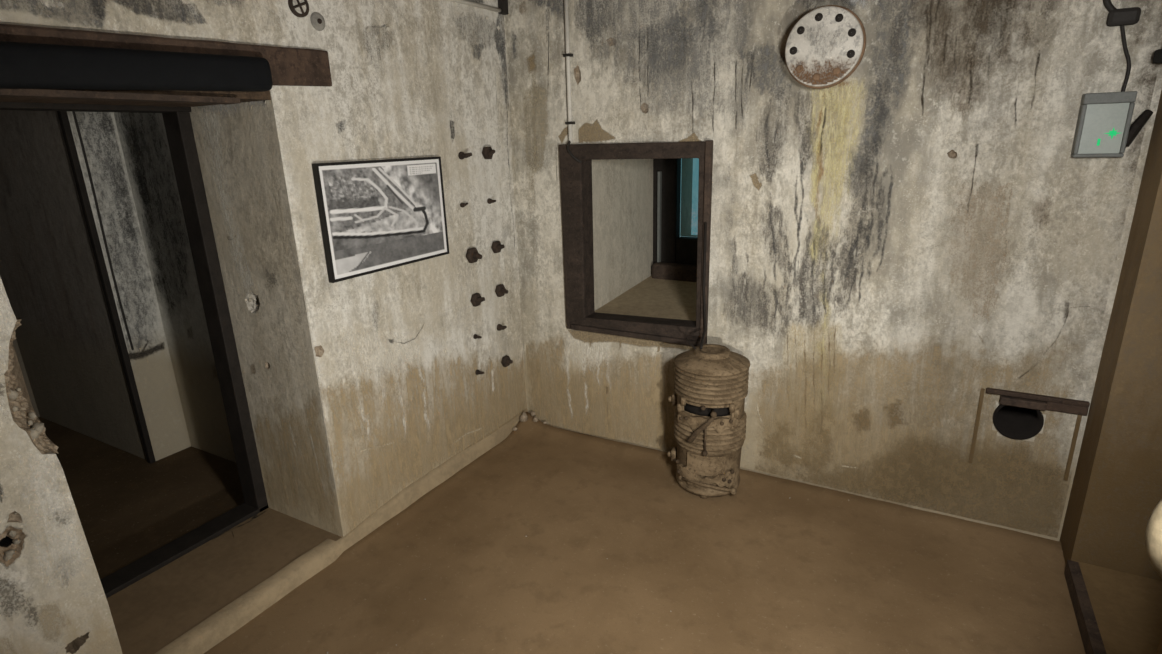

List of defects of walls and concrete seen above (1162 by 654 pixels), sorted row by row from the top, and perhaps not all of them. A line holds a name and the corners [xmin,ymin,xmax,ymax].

damp [538,0,564,16]
damp [495,14,516,165]
rust [790,57,864,259]
damp [578,0,1069,536]
spalling [0,317,58,454]
damp [255,330,696,528]
spalling [0,511,27,567]